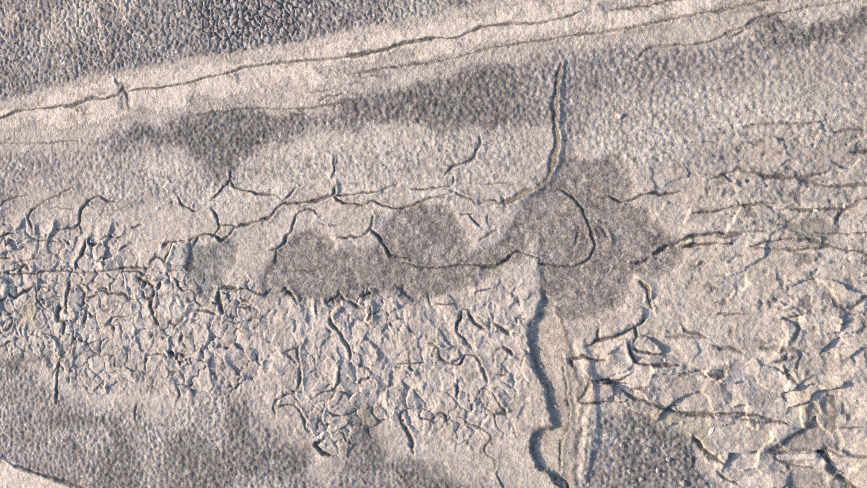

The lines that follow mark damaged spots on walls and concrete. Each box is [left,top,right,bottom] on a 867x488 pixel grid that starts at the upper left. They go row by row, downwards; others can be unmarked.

crack [426,21,553,47]
crack [610,0,672,28]
crack [351,42,419,70]
crack [717,169,772,178]
crack [799,170,867,253]
water stain [256,153,685,321]
water stain [185,238,239,298]
crack [0,66,680,470]
crack [554,210,787,488]
crack [775,359,795,382]
water stain [639,409,712,452]
crack [818,449,857,488]